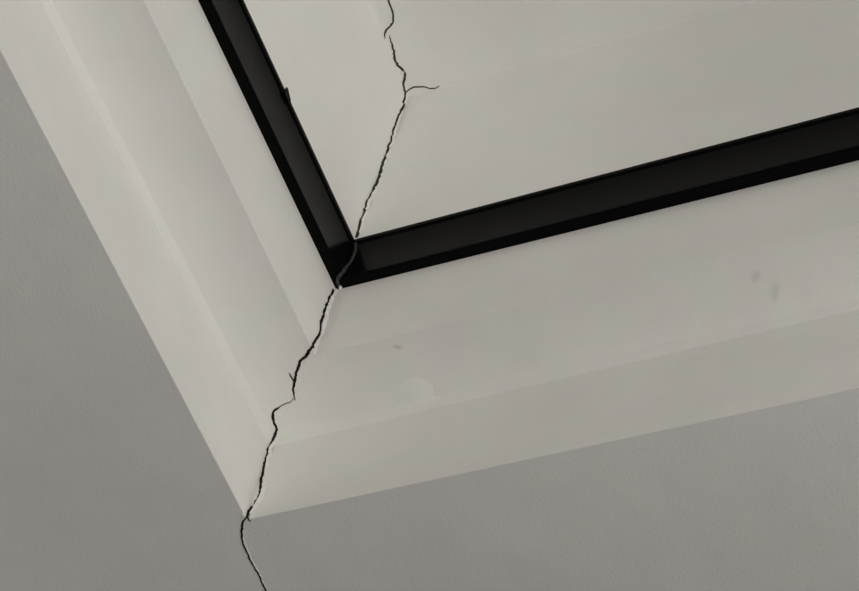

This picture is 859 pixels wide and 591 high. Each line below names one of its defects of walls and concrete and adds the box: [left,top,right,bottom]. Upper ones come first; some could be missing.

crack [355,0,439,238]
crack [240,288,338,591]